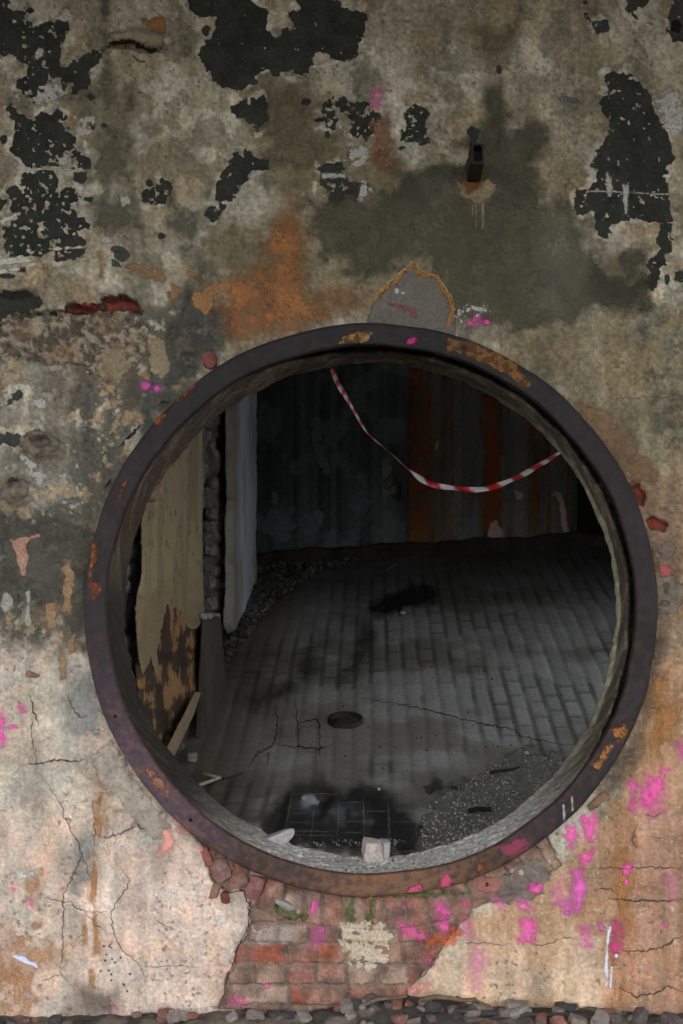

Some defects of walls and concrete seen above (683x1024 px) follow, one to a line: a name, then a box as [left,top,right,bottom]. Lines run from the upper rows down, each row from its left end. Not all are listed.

peeling [187,0,368,132]
spalling [0,0,173,434]
corrosion [456,178,497,229]
damp [300,83,653,329]
peeling [574,71,683,291]
corrosion [97,218,332,347]
damp [370,584,436,617]
corrosion [593,724,627,770]
crack [25,693,197,991]
damp [263,777,427,856]
crack [581,812,683,903]
crack [622,935,683,953]